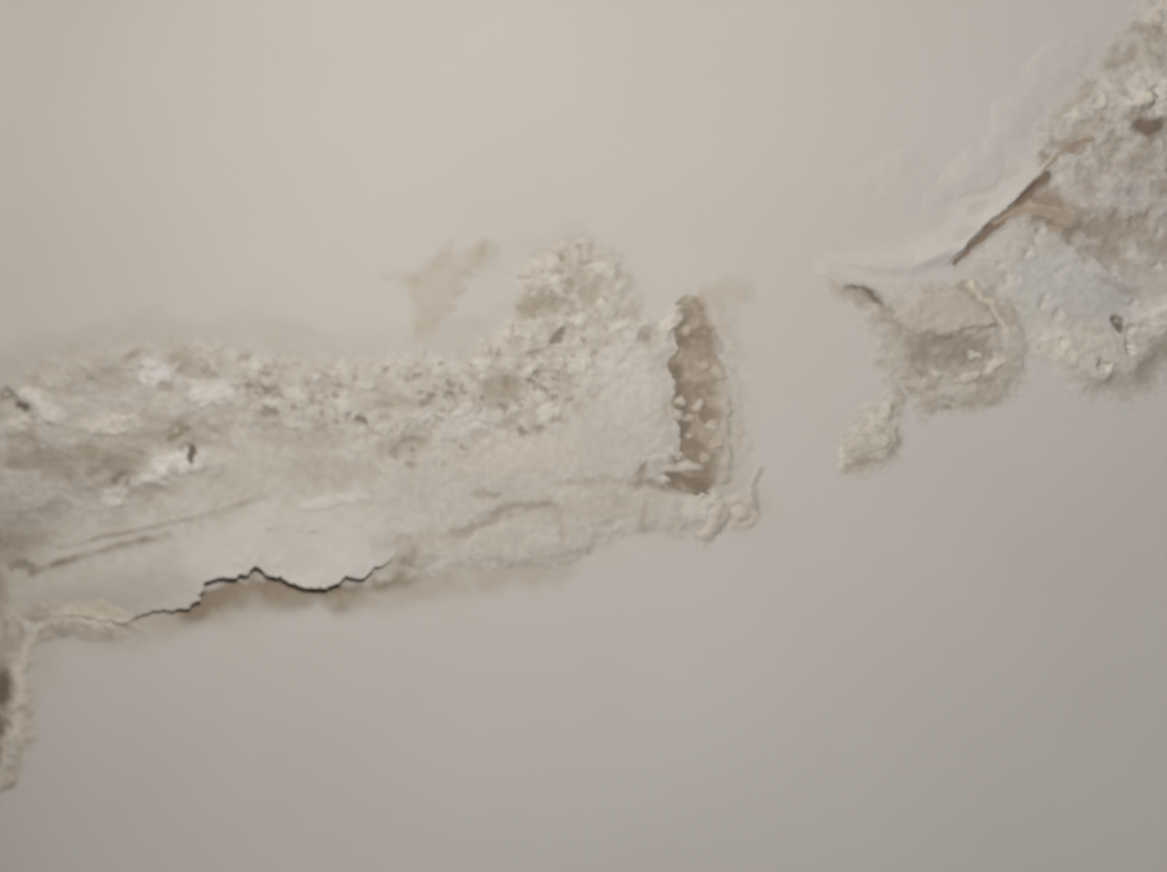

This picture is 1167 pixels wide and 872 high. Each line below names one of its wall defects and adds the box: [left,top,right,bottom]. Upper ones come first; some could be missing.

flaking render [0,235,756,799]
water stain [0,207,788,816]
flaking render [820,0,1167,480]